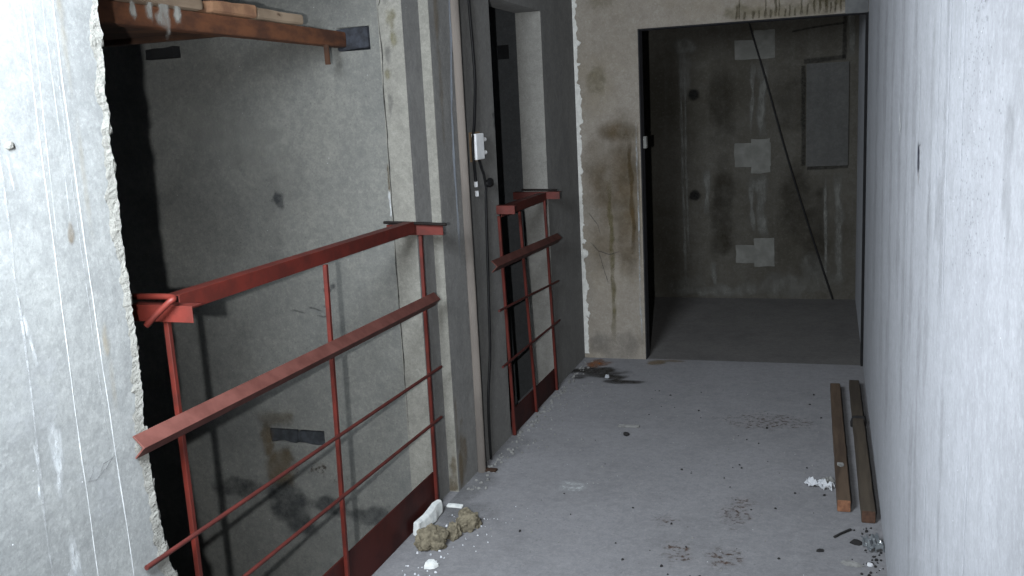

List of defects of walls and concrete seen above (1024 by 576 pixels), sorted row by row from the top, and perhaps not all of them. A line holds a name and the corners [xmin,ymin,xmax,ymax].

leakage [824,184,842,277]